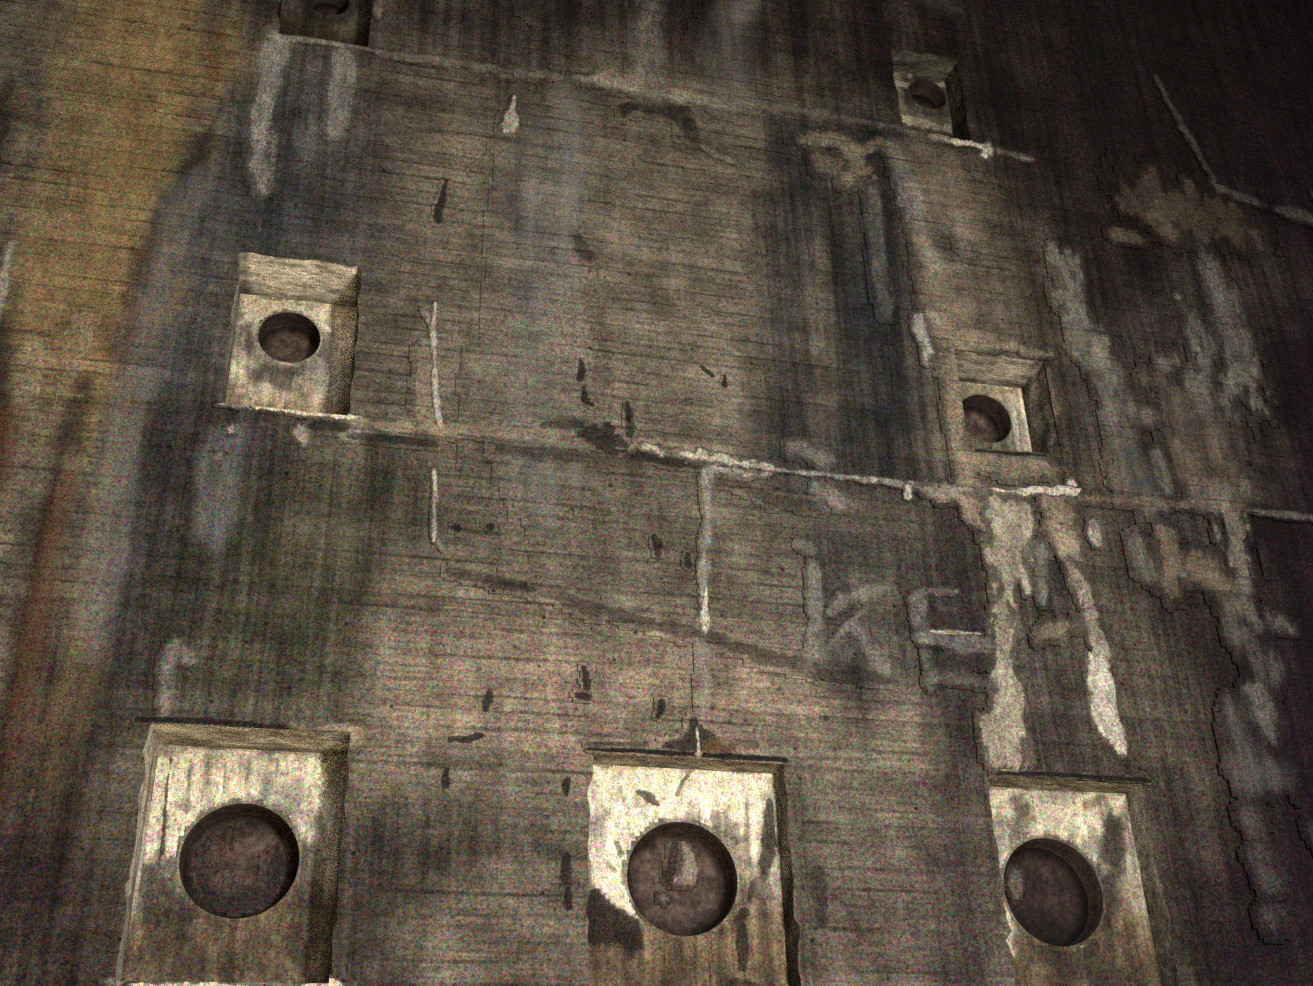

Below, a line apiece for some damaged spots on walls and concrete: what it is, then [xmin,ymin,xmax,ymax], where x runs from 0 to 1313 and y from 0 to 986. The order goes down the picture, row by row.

corrosion [0,0,254,861]
leakage [56,156,232,674]
leakage [152,633,205,715]
leakage [178,0,1313,808]